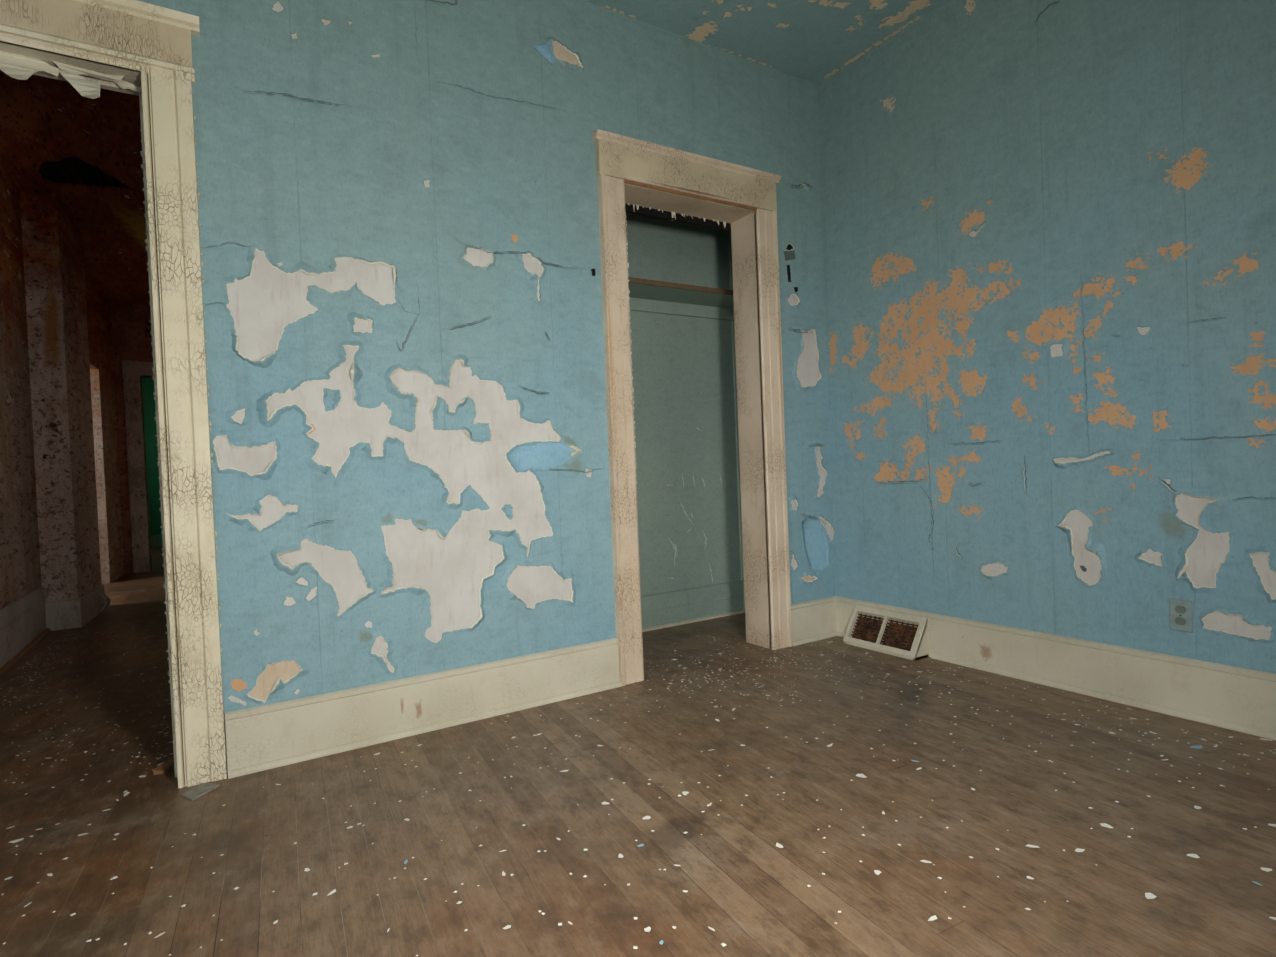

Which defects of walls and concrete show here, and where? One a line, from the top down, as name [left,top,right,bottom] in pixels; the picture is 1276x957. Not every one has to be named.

peeling [0,51,141,108]
peeling [533,37,584,71]
peeling [808,0,931,79]
peeling [1148,147,1209,193]
peeling [1007,240,1198,435]
peeling [792,258,1021,519]
peeling [1223,331,1276,456]
peeling [209,234,582,646]
peeling [1056,506,1112,588]
peeling [1104,450,1276,603]
peeling [1198,607,1276,644]
peeling [228,656,311,706]